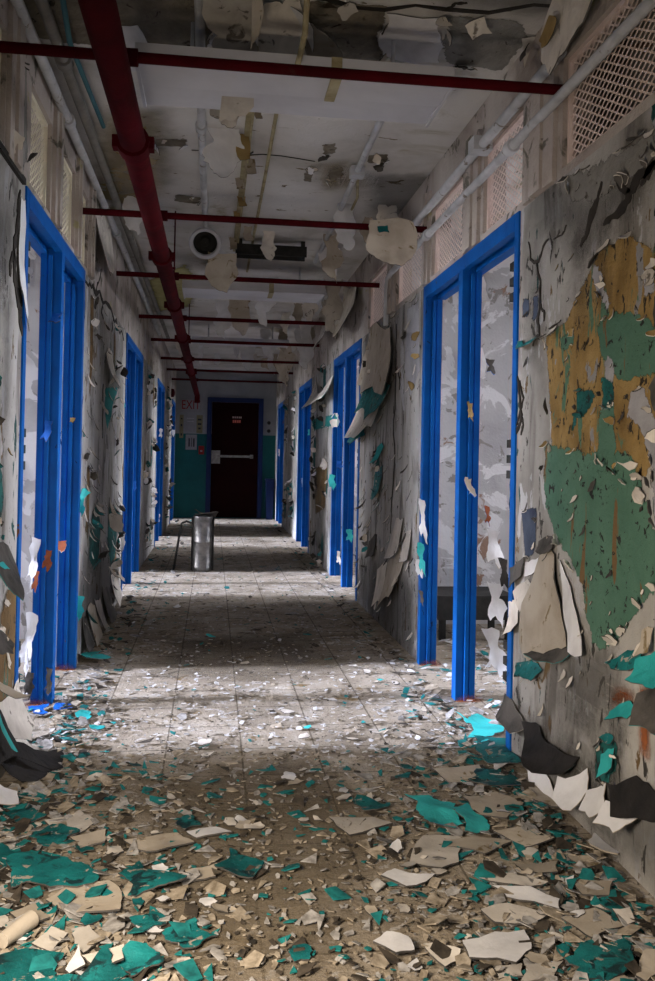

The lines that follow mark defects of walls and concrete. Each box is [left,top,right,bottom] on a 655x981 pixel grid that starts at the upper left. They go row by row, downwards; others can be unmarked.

peeling [309,0,388,62]
peeling [435,16,530,71]
peeling [14,62,38,170]
peeling [556,119,655,203]
peeling [87,295,128,455]
peeling [386,293,420,396]
peeling [536,231,655,664]
peeling [79,430,125,606]
peeling [355,449,412,568]
peeling [0,589,16,702]
peeling [576,732,618,786]